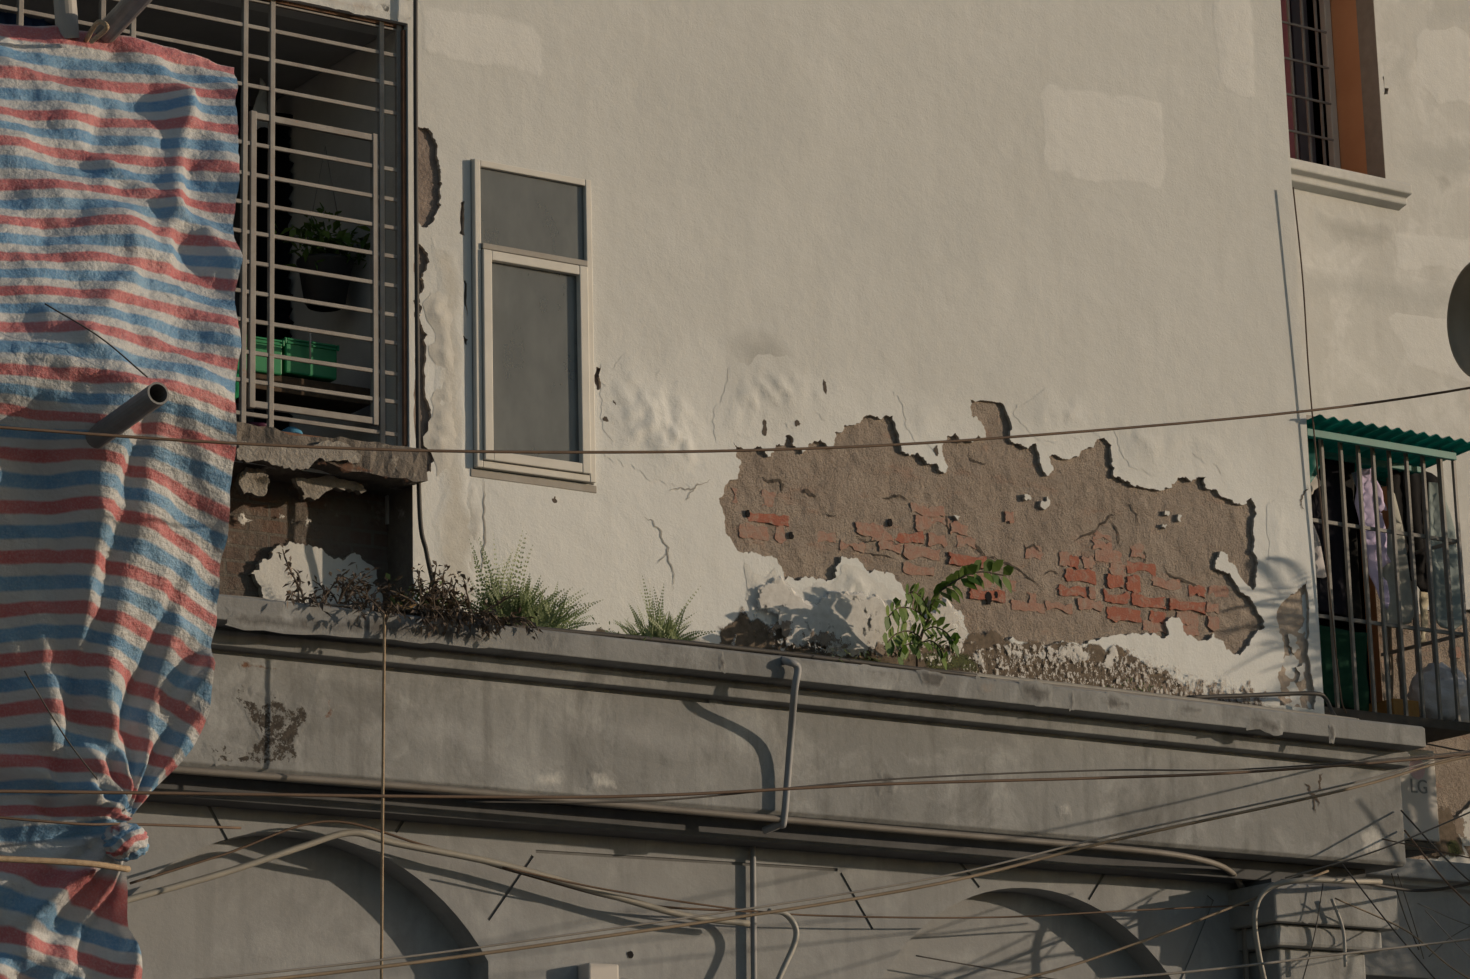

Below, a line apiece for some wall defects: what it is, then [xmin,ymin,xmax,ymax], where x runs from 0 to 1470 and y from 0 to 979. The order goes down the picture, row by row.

peeling [418,129,440,228]
peeling [413,247,433,472]
spalling [235,440,367,502]
peeling [248,541,383,611]
peeling [719,401,1313,709]
peeling [1375,588,1470,700]
leakage [201,673,503,768]
peeling [1419,734,1470,855]